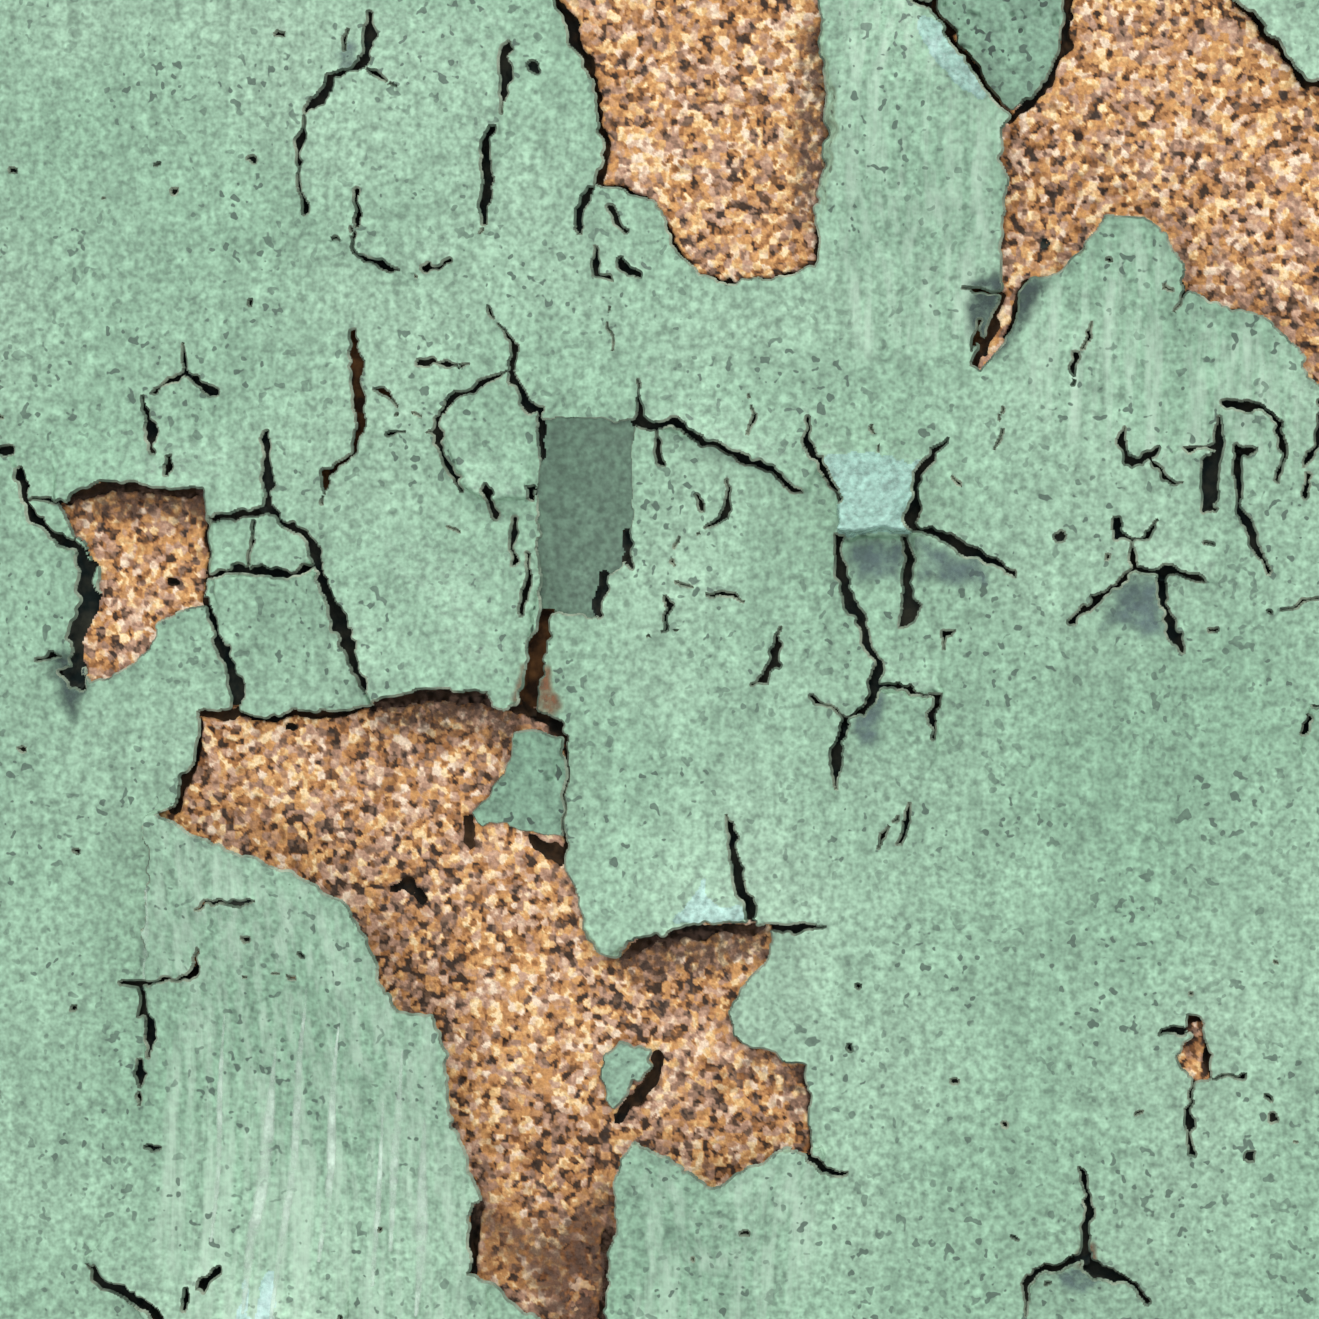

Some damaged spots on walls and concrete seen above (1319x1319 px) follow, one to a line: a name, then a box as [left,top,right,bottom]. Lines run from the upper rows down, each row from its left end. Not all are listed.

peeling [555,0,829,284]
peeling [917,0,1319,384]
crack [207,431,367,705]
crack [417,308,556,708]
crack [631,383,842,527]
crack [810,535,941,787]
crack [899,441,1015,641]
crack [1068,518,1204,653]
peeling [1066,405,1319,691]
crack [1117,400,1319,574]
peeling [53,334,1024,1319]
peeling [1177,1015,1212,1081]